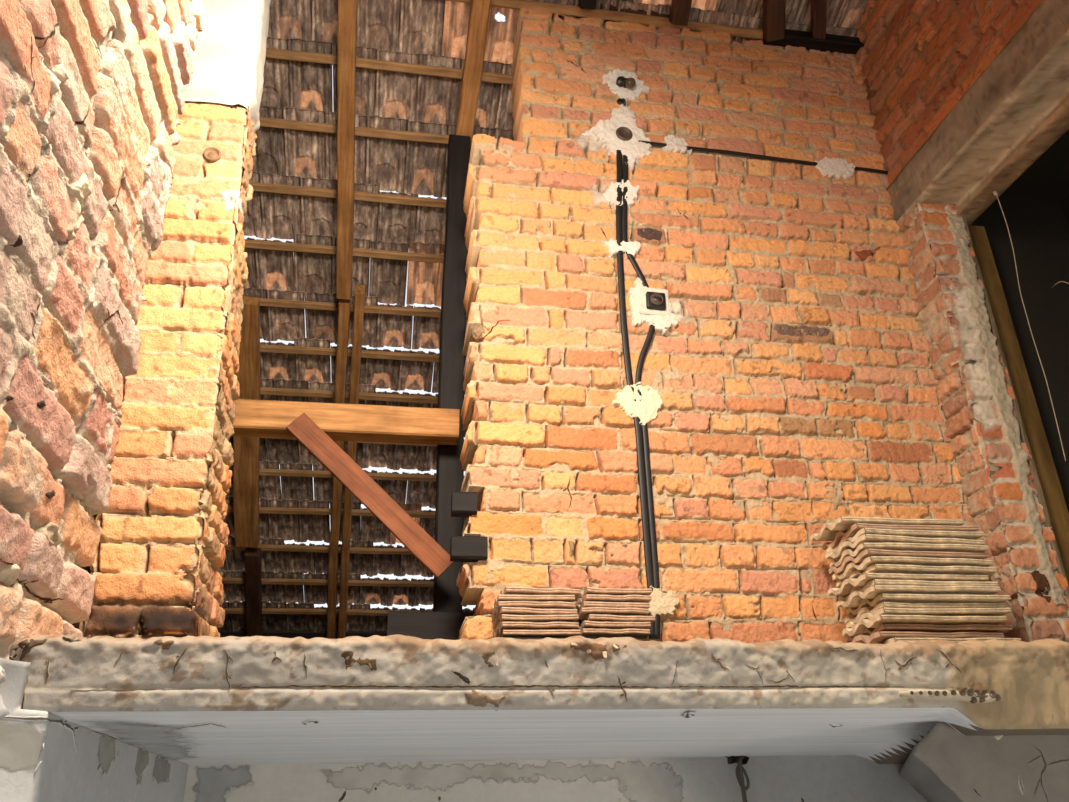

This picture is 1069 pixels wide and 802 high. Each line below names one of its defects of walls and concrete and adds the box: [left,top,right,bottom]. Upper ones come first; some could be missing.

crack [30,22,59,91]
spalling [341,651,377,670]
spalling [570,636,627,660]
spalling [451,669,505,711]
peeling [98,734,119,777]
peeling [134,748,170,784]
peeling [193,765,253,802]
peeling [324,761,683,802]
crack [1018,743,1069,802]